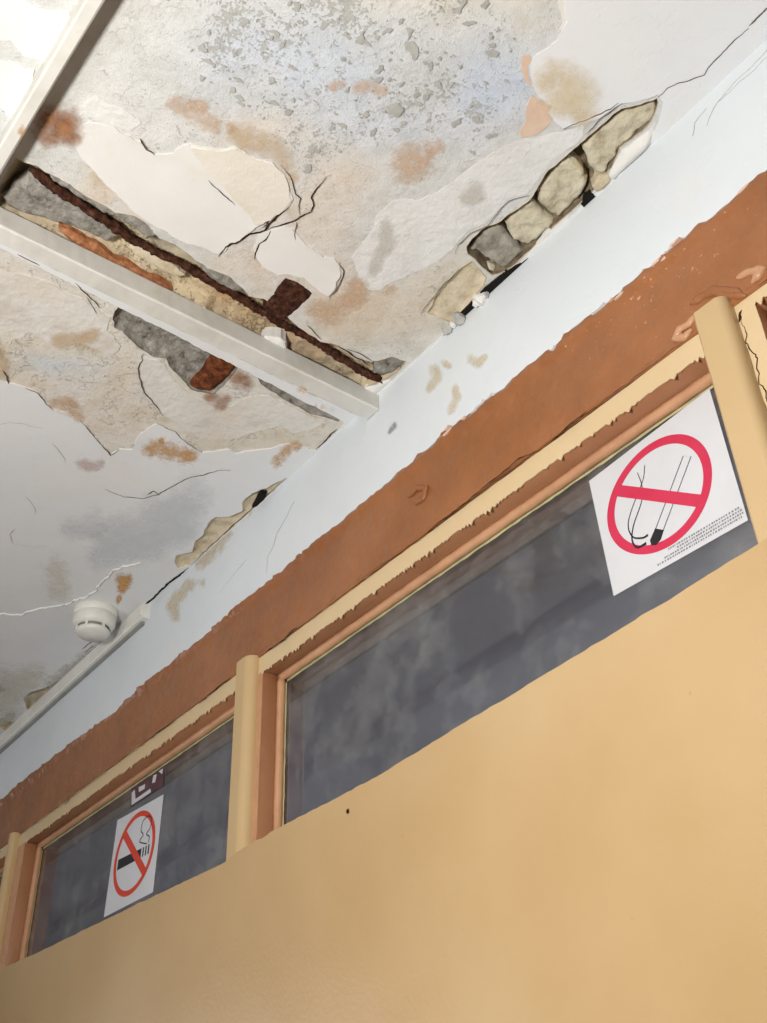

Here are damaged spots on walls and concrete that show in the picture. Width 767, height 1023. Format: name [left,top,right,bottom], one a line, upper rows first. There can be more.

corrosion [41,110,79,143]
peeling [0,0,663,395]
crack [0,371,66,460]
crack [105,354,229,499]
peeling [0,248,352,455]
peeling [442,393,495,436]
crack [738,310,767,401]
crack [145,480,294,604]
flaking render [174,478,286,568]
crack [267,343,681,651]
crack [20,678,230,836]